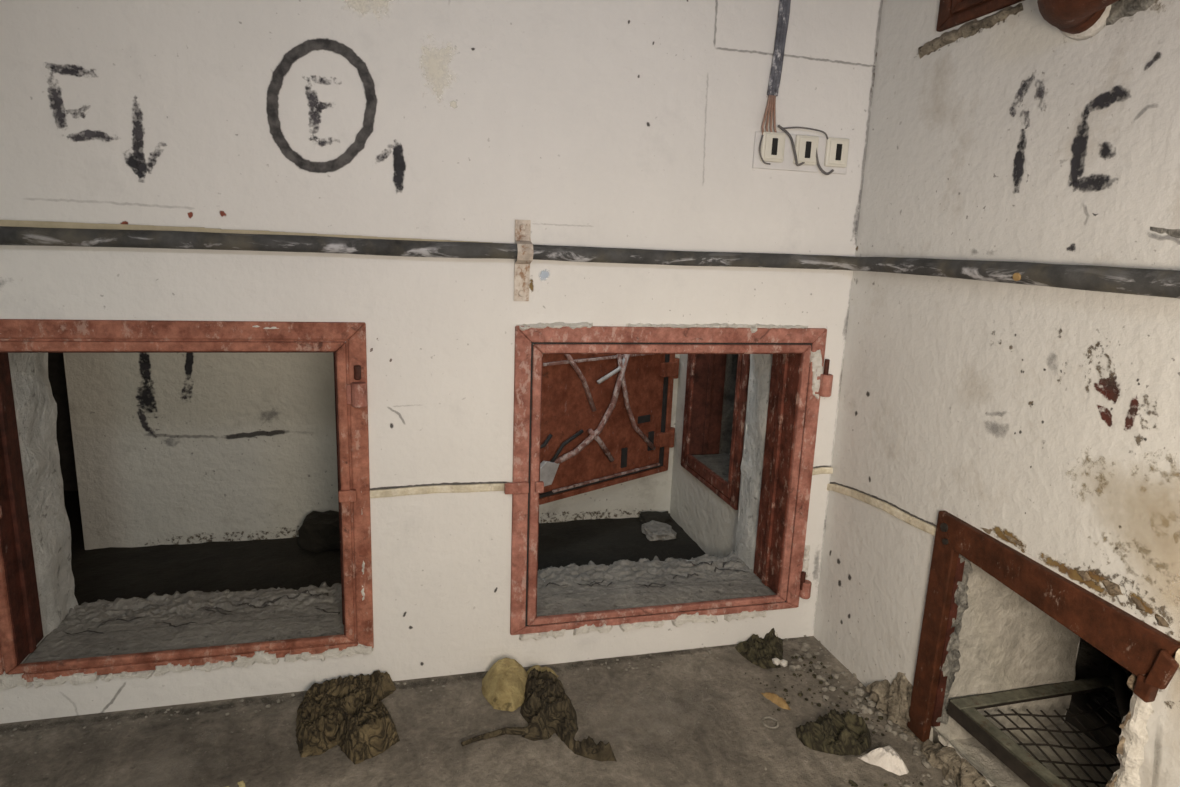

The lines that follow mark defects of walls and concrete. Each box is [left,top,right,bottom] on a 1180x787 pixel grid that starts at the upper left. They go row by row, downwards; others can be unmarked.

spalling [981,528,1024,547]
spalling [1076,570,1169,627]
spalling [865,554,996,787]
spalling [1106,674,1158,787]